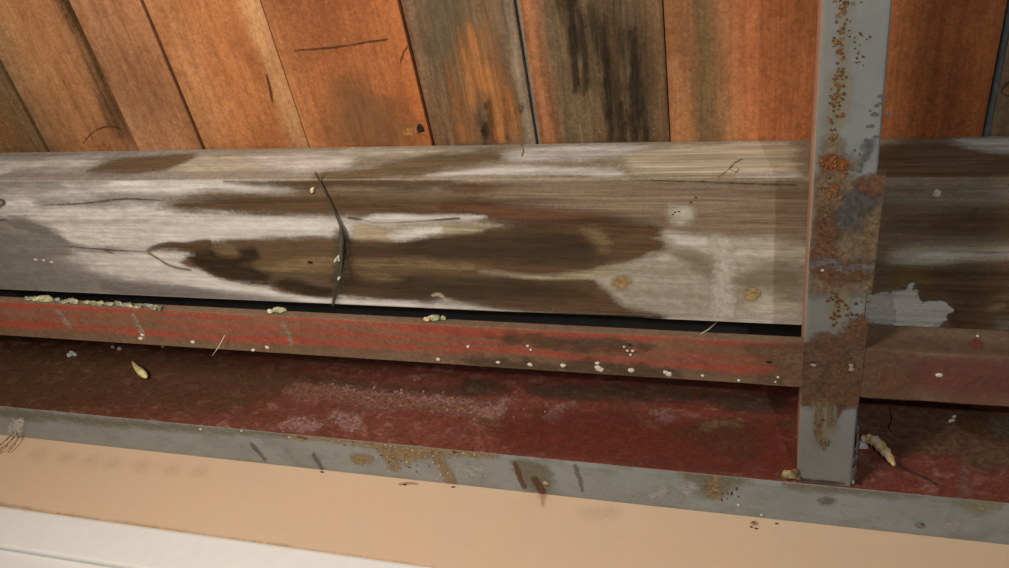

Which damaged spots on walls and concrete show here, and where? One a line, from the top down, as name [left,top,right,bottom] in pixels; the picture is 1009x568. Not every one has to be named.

damp [0,0,806,325]
damp [877,138,1009,177]
rust [800,0,1009,471]
peeling [865,283,954,327]
damp [870,245,1009,330]